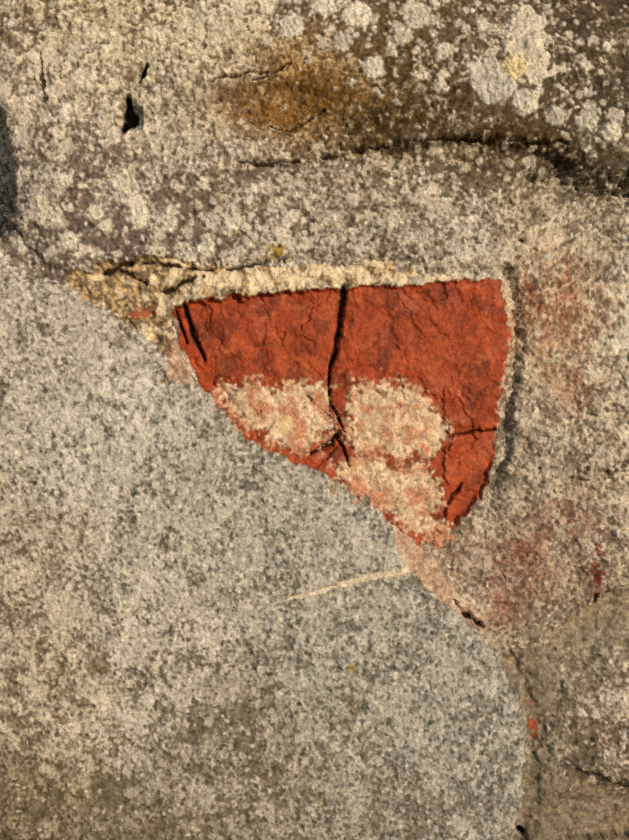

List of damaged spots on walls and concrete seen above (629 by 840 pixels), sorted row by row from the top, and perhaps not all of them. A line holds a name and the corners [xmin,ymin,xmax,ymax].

crack [210,63,290,83]
crack [309,285,349,462]
crack [448,429,496,450]
spalling [211,374,454,550]
crack [443,483,462,523]